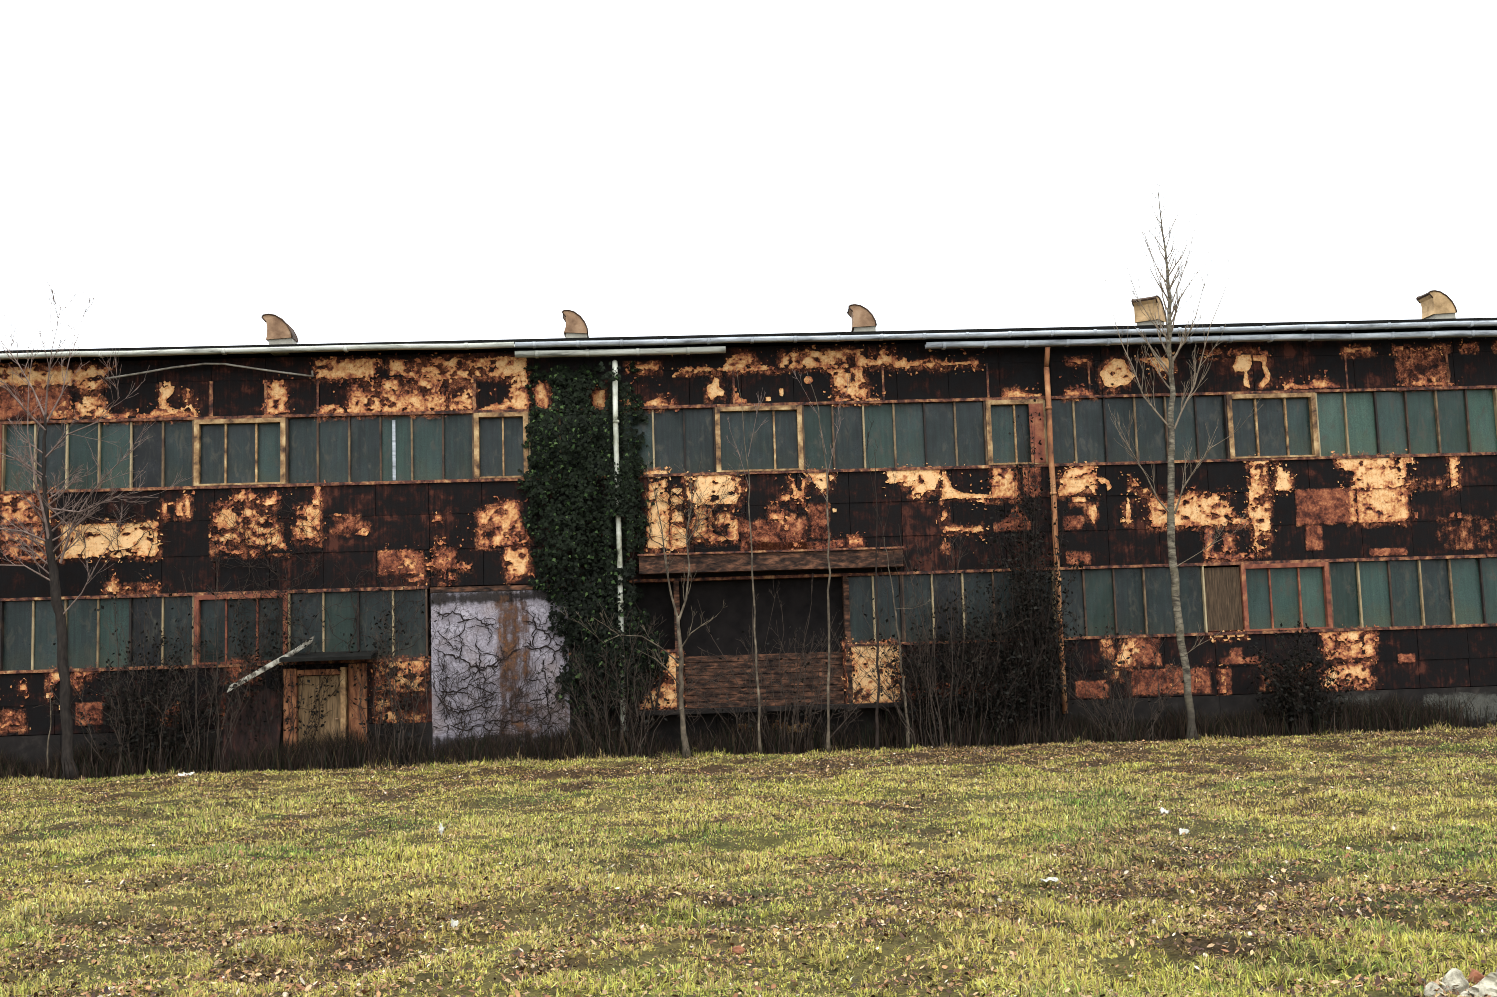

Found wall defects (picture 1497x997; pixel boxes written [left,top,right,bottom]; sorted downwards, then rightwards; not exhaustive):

peeling [261,352,553,420]
peeling [591,343,985,413]
peeling [0,480,341,595]
corrosion [740,504,865,551]
peeling [883,463,1023,555]
corrosion [993,467,1041,532]
peeling [1057,453,1297,563]
corrosion [1295,487,1353,550]
peeling [1331,449,1418,528]
crack [432,603,567,737]
corrosion [1129,637,1278,695]
corrosion [75,702,103,725]